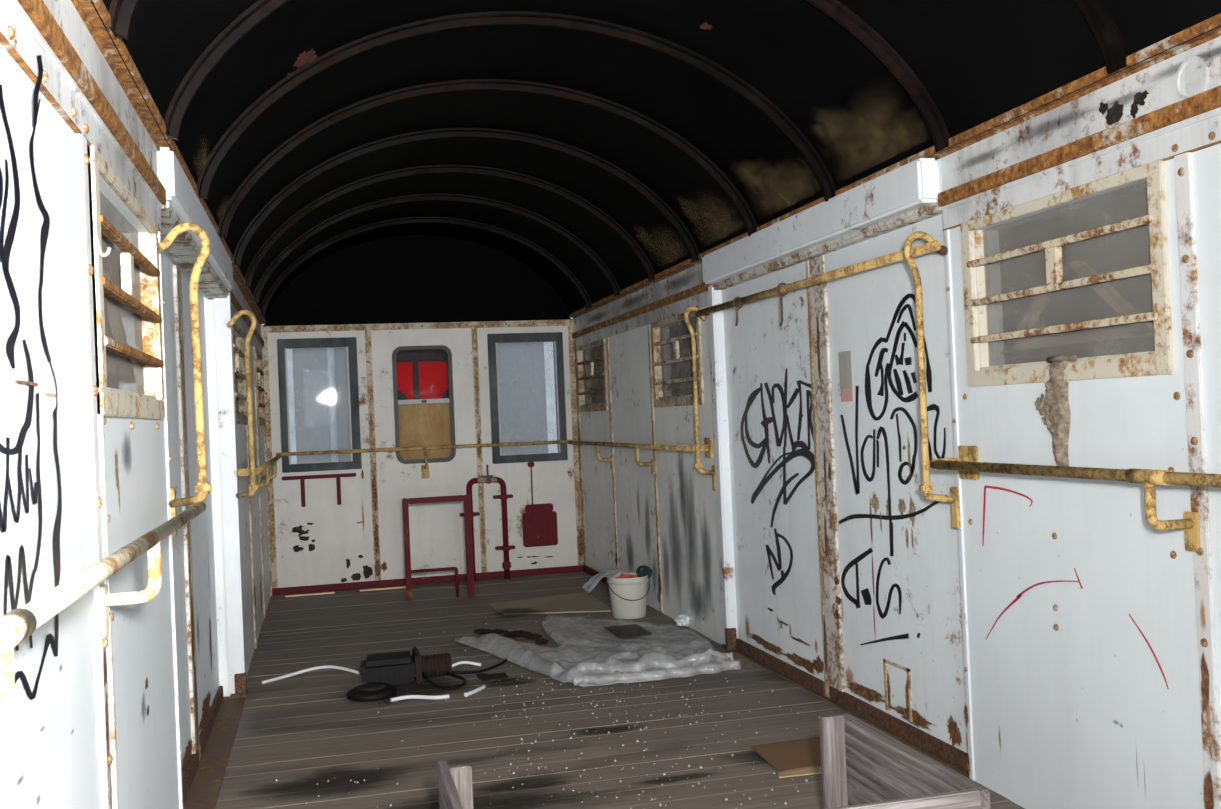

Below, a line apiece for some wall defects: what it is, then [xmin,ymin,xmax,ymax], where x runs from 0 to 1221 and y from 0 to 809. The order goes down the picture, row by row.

rust [0,31,92,146]
damp [740,165,804,207]
damp [817,108,909,166]
rust [1086,140,1221,184]
rust [809,307,821,382]
peeling [292,523,316,552]
damp [654,462,710,613]
peeling [341,555,387,582]
rust [847,671,932,730]
rust [1201,655,1211,735]
rust [947,704,970,774]
rust [1204,772,1214,809]